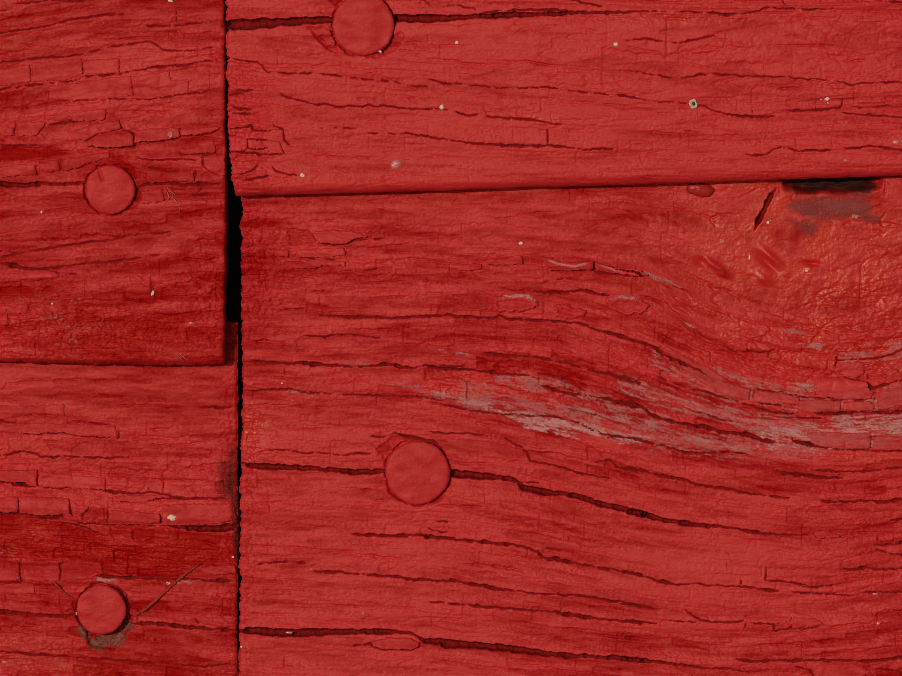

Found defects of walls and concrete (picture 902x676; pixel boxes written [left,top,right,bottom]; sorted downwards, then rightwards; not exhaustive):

peeling [0,58,120,86]
crack [0,0,902,201]
peeling [0,109,283,204]
crack [754,188,777,230]
peeling [663,346,902,413]
peeling [0,470,106,516]
crack [0,419,239,533]
peeling [109,494,237,526]
crack [200,307,902,597]
peeling [0,560,104,594]
crack [257,561,819,632]
crack [131,619,902,676]